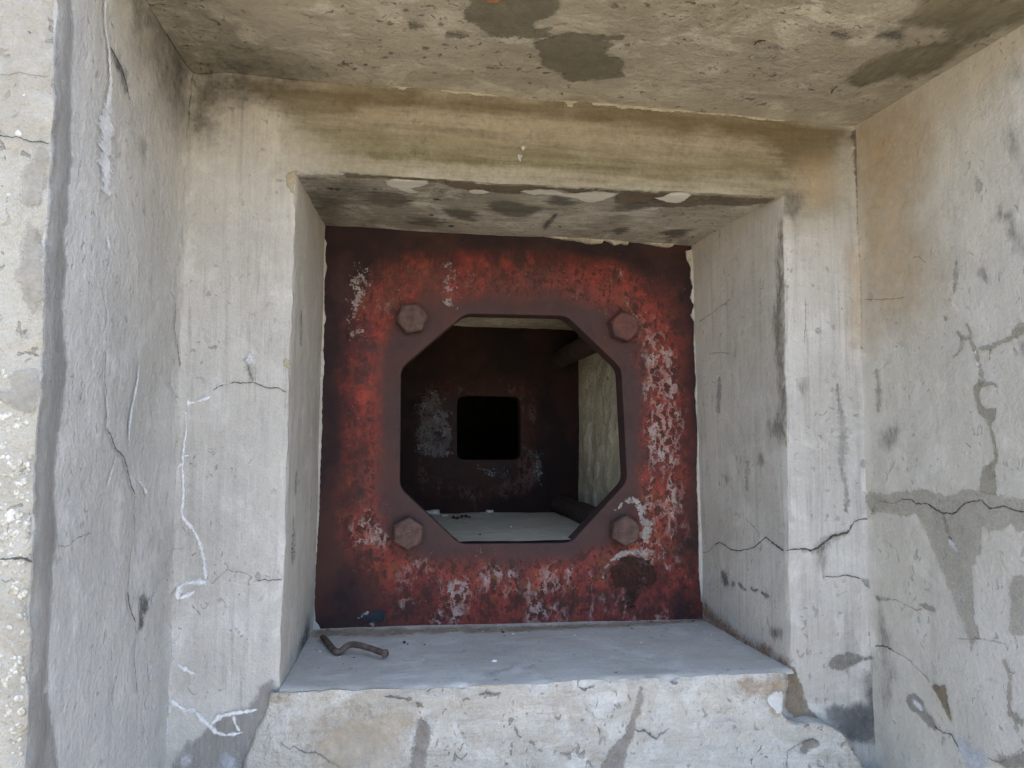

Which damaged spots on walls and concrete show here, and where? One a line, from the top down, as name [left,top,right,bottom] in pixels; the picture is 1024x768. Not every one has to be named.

water stain [423,23,468,59]
water stain [848,0,1024,87]
water stain [560,104,846,163]
flaking render [344,172,774,227]
flaking render [659,230,692,241]
crack [170,318,286,406]
crack [106,390,135,522]
flaking render [865,323,1024,645]
crack [715,499,1024,552]
corrosion [609,557,657,610]